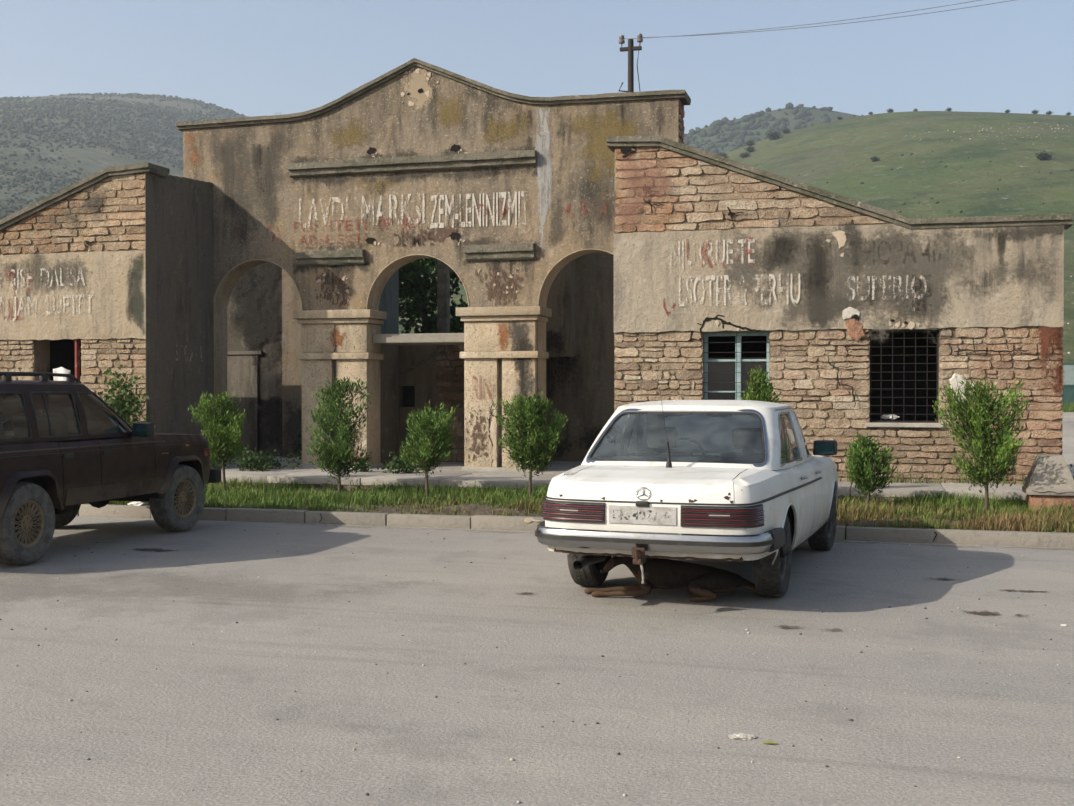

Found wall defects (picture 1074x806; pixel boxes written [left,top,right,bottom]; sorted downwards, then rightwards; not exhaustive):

spalling [400,68,439,110]
leakage [129,255,144,333]
crack [697,315,761,332]
spalling [842,307,865,341]
leakage [727,217,1064,340]
flaking render [435,345,498,467]